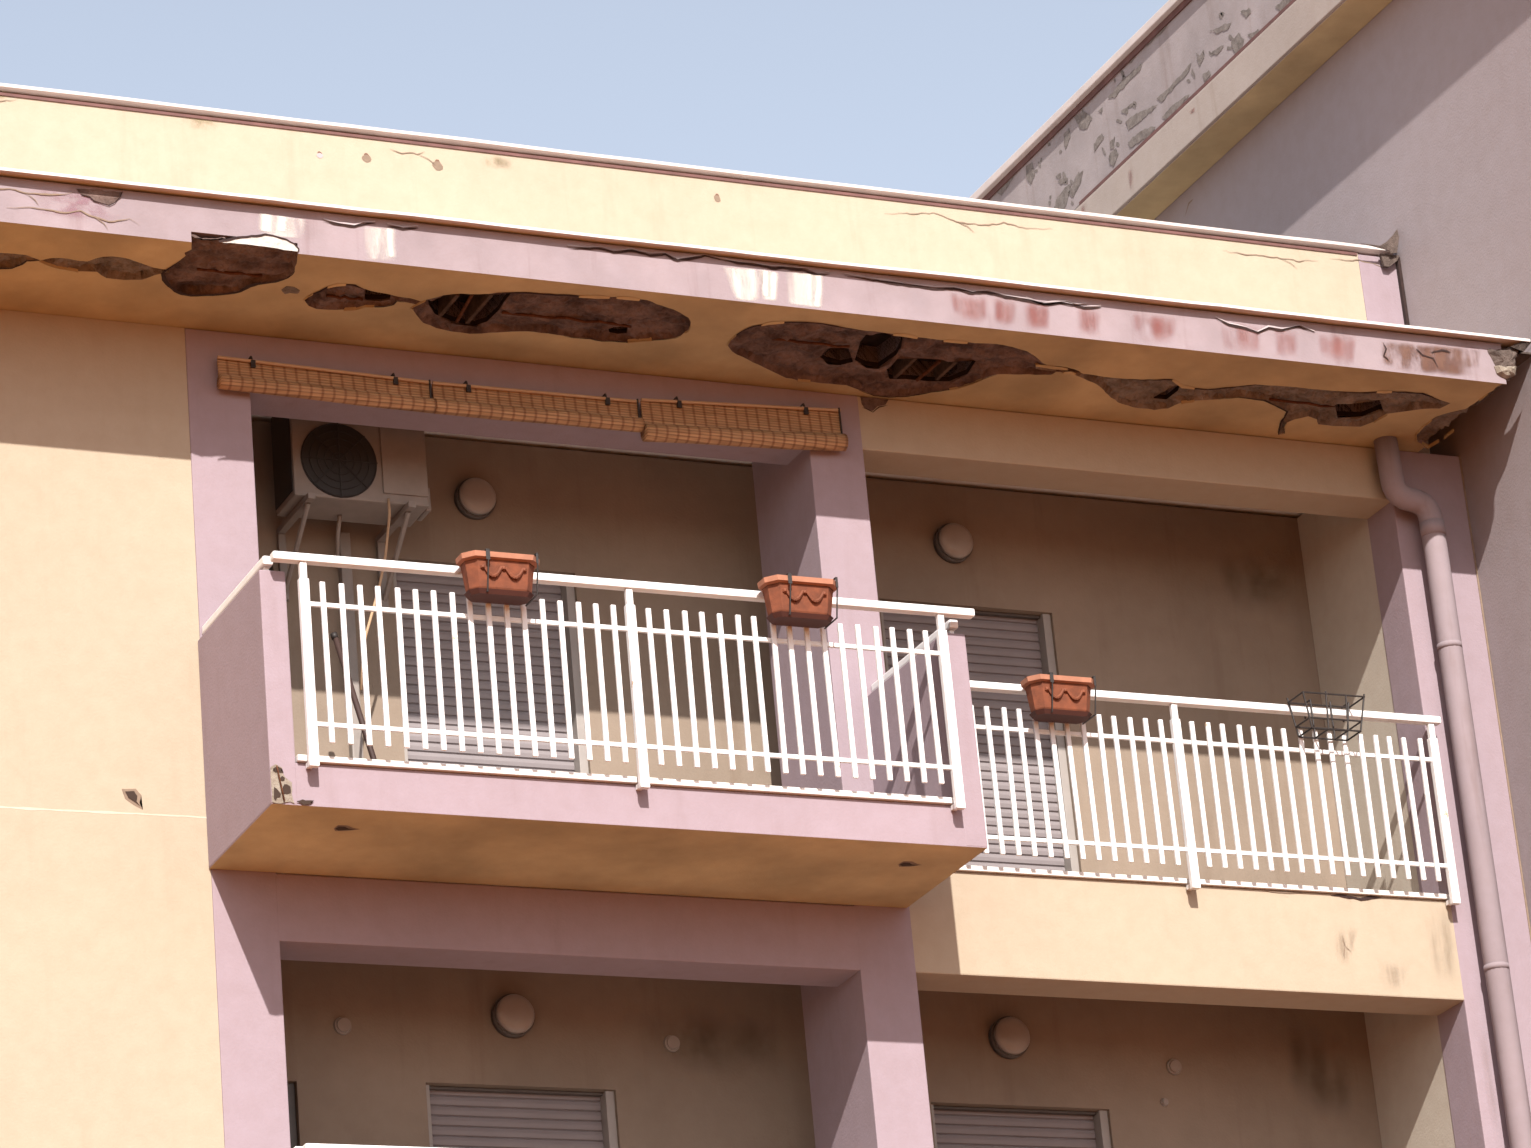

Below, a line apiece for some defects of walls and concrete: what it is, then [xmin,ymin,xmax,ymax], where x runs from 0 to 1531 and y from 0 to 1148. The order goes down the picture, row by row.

peeling [989,8,1259,211]
crack [884,212,1051,233]
spalling [0,233,691,343]
spalling [727,321,1519,449]
flaking render [122,789,143,810]
spalling [270,764,314,805]